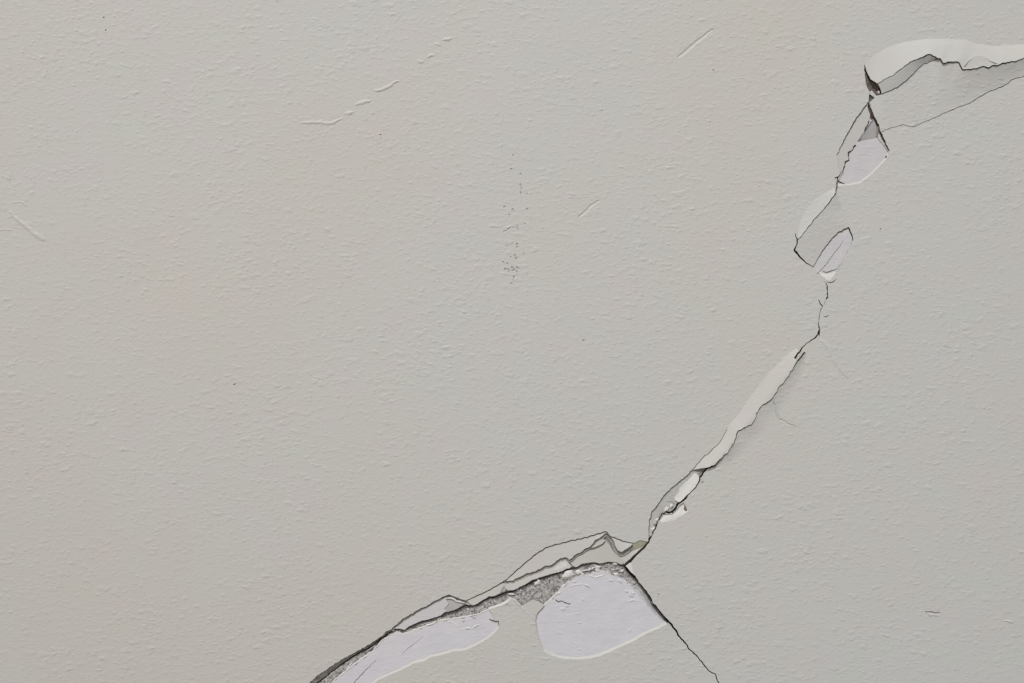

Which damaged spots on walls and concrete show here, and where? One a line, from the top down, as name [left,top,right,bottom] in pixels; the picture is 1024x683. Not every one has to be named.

peeling [838,138,888,186]
peeling [813,227,853,281]
crack [310,54,1024,683]
peeling [332,570,667,683]